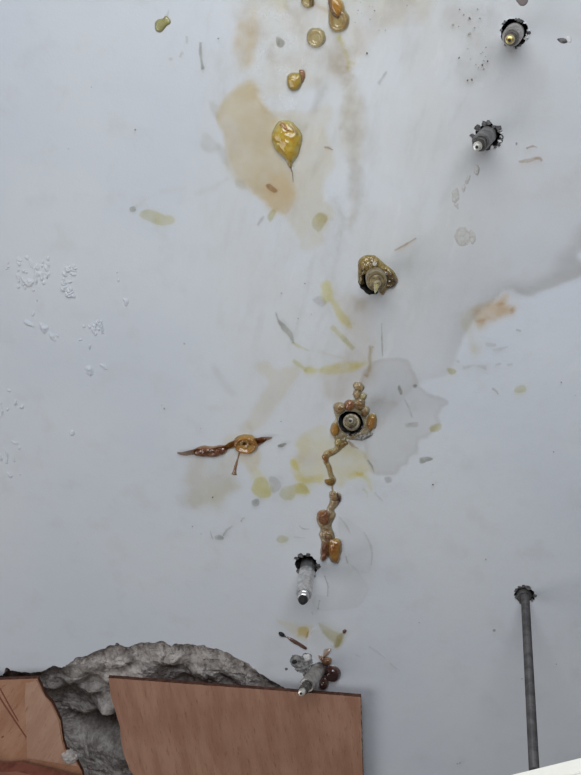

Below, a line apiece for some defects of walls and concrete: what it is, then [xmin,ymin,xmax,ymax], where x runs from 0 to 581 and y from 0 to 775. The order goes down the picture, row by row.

spalling [0,641,284,775]